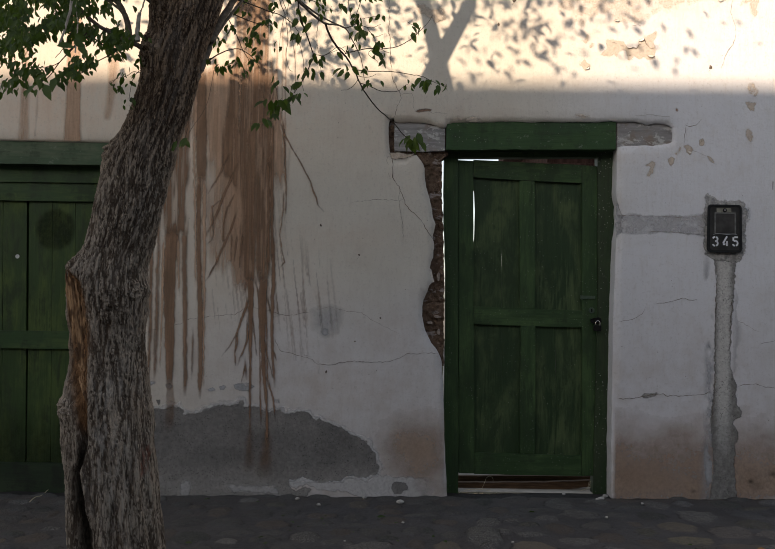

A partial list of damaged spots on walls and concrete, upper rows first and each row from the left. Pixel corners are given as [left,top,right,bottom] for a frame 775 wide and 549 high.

peeling [602,32,656,60]
damp [147,74,207,392]
crack [352,157,433,239]
flaking render [389,119,448,366]
flaking render [154,383,381,497]
damp [615,440,724,500]
damp [734,447,775,500]